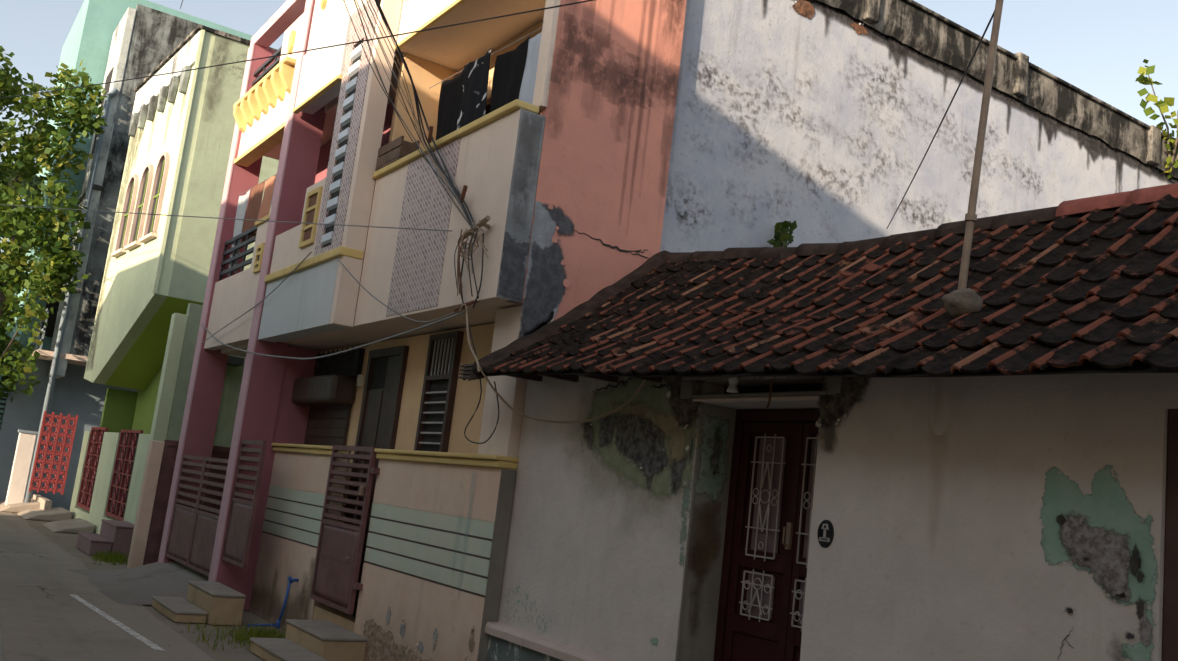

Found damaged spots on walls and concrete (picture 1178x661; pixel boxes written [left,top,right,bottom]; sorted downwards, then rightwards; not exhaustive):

damp [796,0,1178,193]
peeling [518,201,574,339]
crack [574,230,650,259]
peeling [581,377,702,566]
damp [689,507,719,574]
peeling [1039,464,1158,661]
flaking render [363,607,438,661]